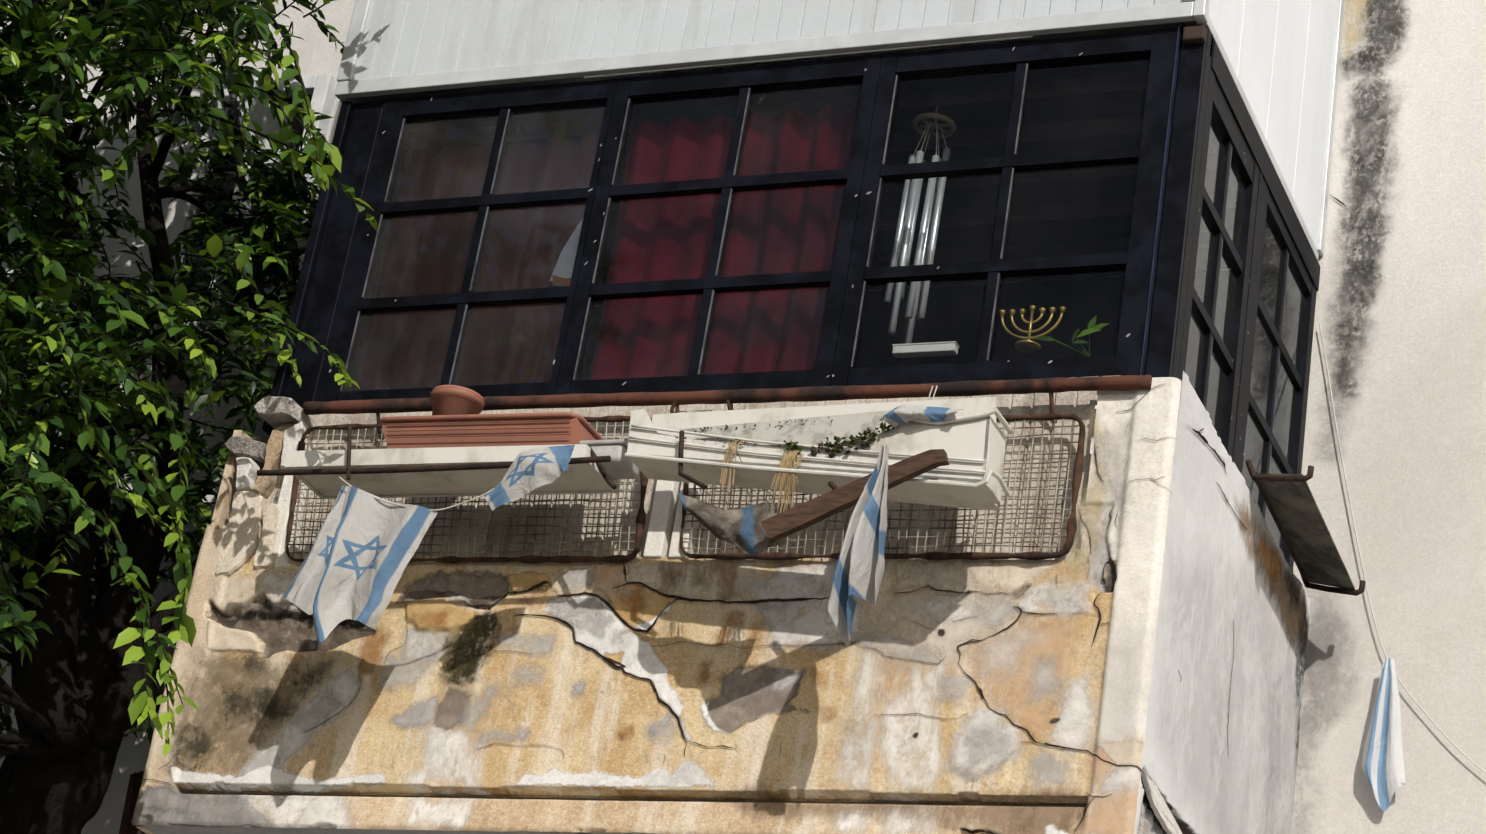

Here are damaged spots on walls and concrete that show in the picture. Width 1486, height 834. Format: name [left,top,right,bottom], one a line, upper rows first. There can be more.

damp [1331,0,1406,417]
damp [175,654,324,772]
peeling [132,669,385,831]
spalling [207,421,376,657]
damp [407,613,498,830]
peeling [380,562,809,743]
peeling [516,760,716,790]
crack [489,446,1172,829]